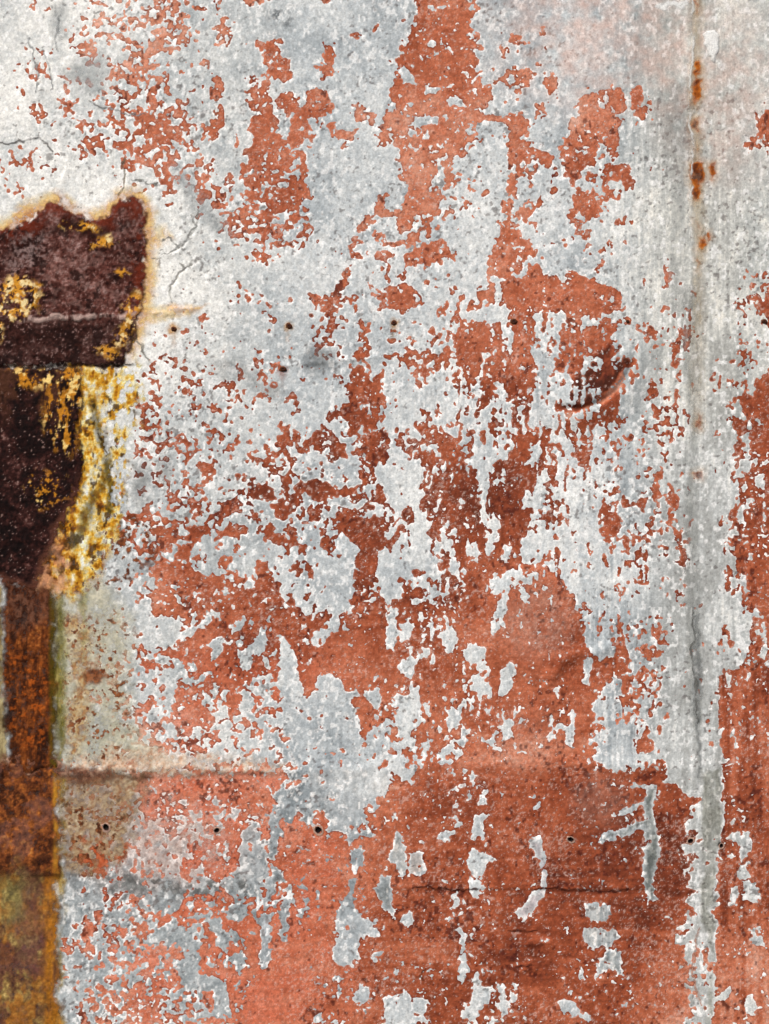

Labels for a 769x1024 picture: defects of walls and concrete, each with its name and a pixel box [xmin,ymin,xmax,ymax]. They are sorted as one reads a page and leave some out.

corrosion [692,61,702,102]
peeling [13,0,359,266]
peeling [736,102,769,155]
peeling [0,138,57,199]
corrosion [690,162,716,199]
peeling [307,264,363,361]
peeling [733,268,769,328]
peeling [636,305,704,382]
corrosion [0,192,200,1024]
peeling [510,547,593,624]
crack [413,884,478,892]
crack [538,885,629,893]